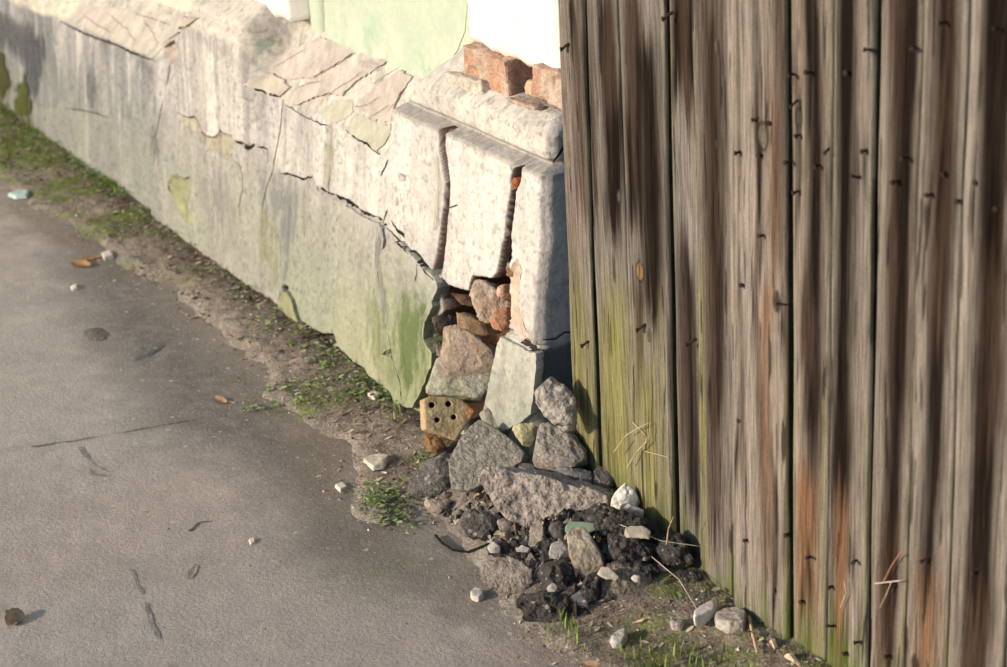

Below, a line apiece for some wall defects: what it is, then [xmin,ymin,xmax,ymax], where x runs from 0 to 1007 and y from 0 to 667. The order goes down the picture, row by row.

damp [0,13,45,100]
peeling [68,4,198,63]
peeling [243,0,562,152]
spalling [168,176,194,225]
spalling [176,113,235,160]
crack [60,21,444,290]
crack [512,175,522,189]
crack [505,246,513,277]
spalling [432,259,531,357]
crack [129,568,172,667]